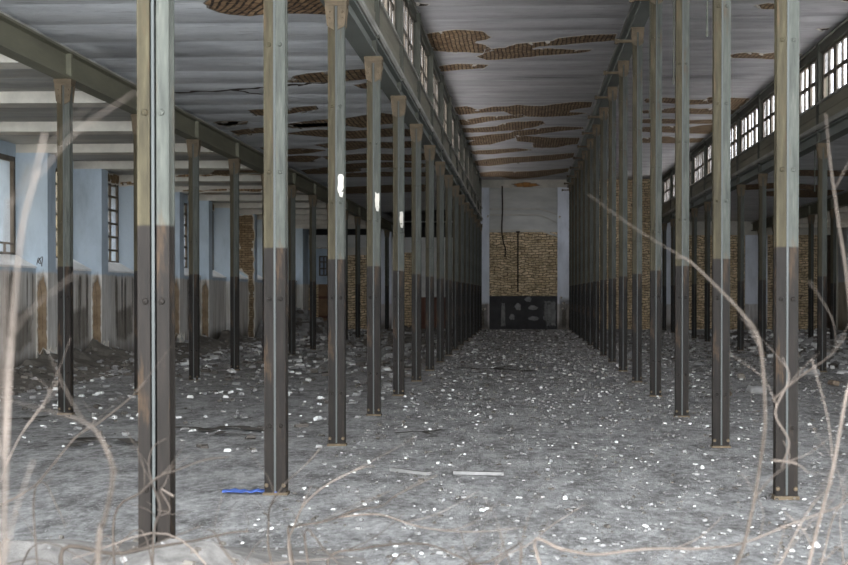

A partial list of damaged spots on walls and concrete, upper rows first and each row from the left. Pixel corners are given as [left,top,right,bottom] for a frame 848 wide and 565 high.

flaking render [203,0,263,16]
flaking render [288,0,326,15]
flaking render [288,71,328,83]
flaking render [346,69,367,89]
flaking render [427,29,617,72]
flaking render [288,106,328,174]
flaking render [337,113,393,211]
flaking render [404,122,426,192]
flaking render [454,101,593,179]
leakage [6,274,47,357]
leakage [73,276,101,344]
leakage [115,278,134,339]